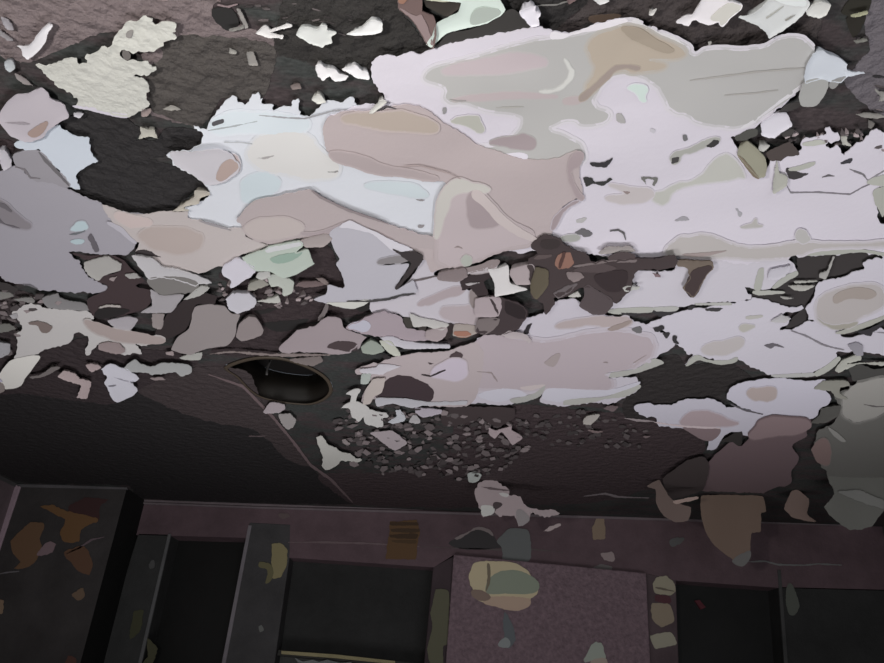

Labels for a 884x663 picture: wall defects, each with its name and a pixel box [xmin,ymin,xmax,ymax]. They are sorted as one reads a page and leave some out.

spalling [575,217,592,237]
spalling [751,252,883,328]
spalling [858,322,884,336]
peeling [811,354,884,424]
spalling [0,234,766,649]
peeling [784,490,816,522]